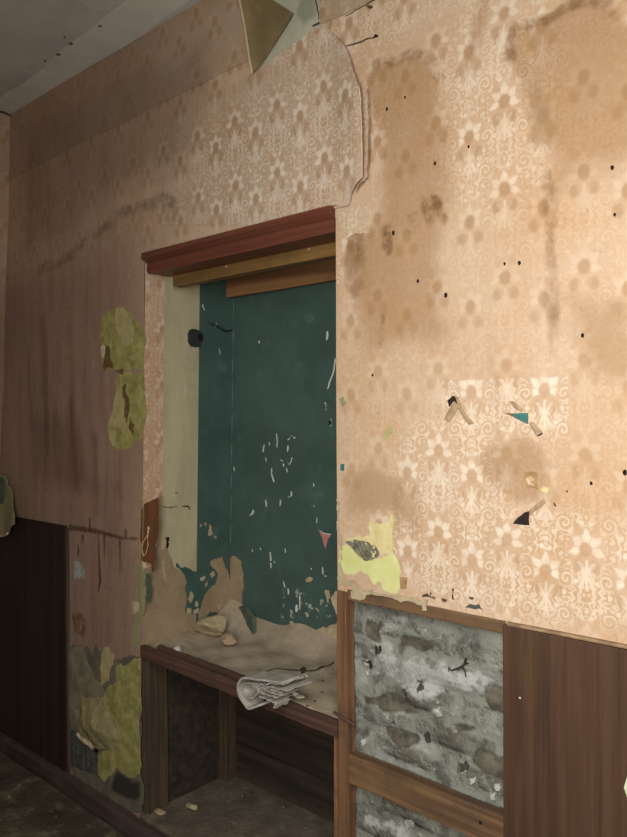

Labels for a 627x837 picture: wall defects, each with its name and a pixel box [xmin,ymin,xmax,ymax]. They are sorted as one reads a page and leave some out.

flaking render [260,0,321,67]
peeling [100,306,146,451]
peeling [338,514,400,594]
peeling [295,588,337,639]
peeling [69,536,244,815]